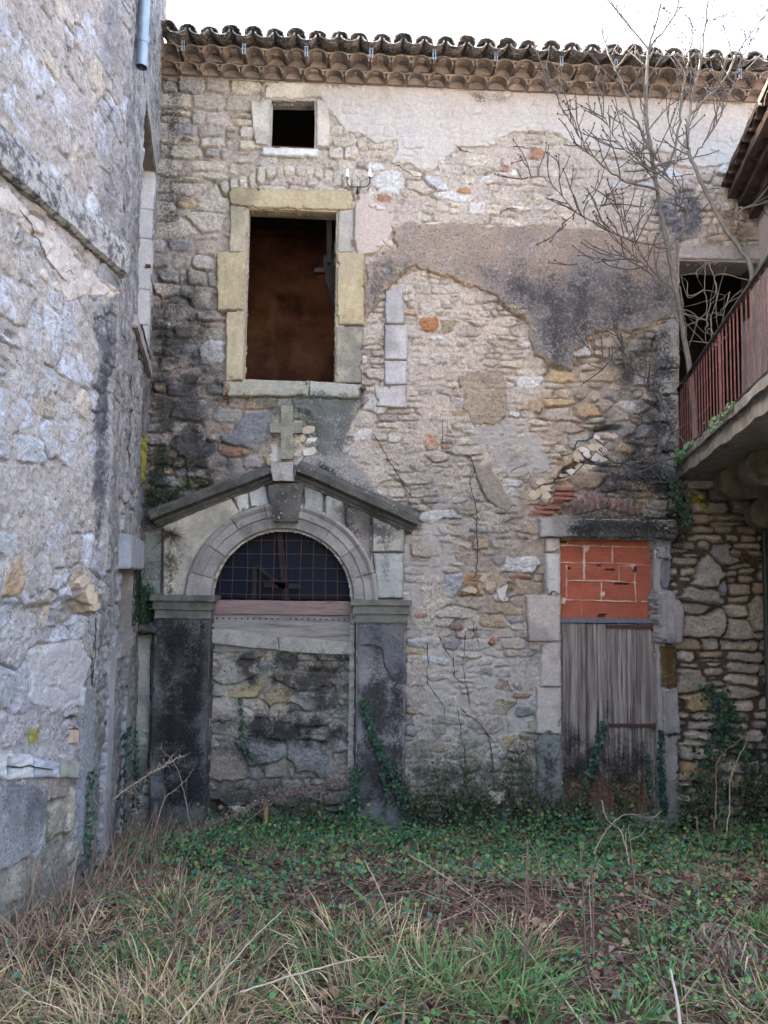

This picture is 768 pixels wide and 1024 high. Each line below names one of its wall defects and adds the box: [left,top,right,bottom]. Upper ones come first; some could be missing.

flaking render [317,86,748,176]
flaking render [364,220,681,372]
water stain [507,279,666,351]
water stain [140,286,216,509]
water stain [159,624,406,822]